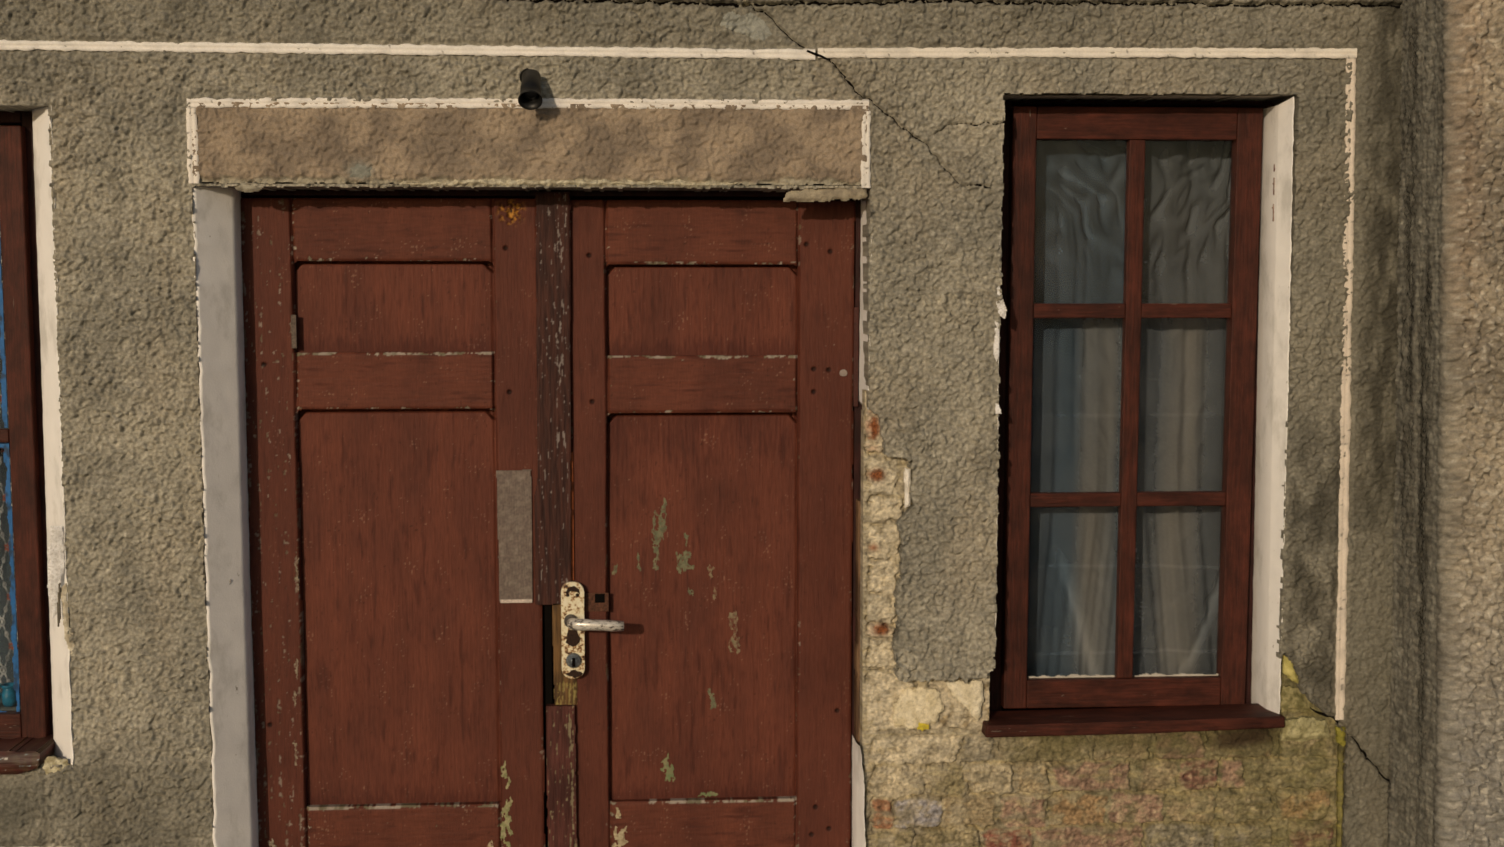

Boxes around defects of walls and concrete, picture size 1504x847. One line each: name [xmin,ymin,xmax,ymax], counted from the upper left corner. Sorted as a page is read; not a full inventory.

crack [506,0,1400,188]
peeling [993,286,1007,361]
spalling [860,389,1338,847]
crack [1310,707,1390,783]